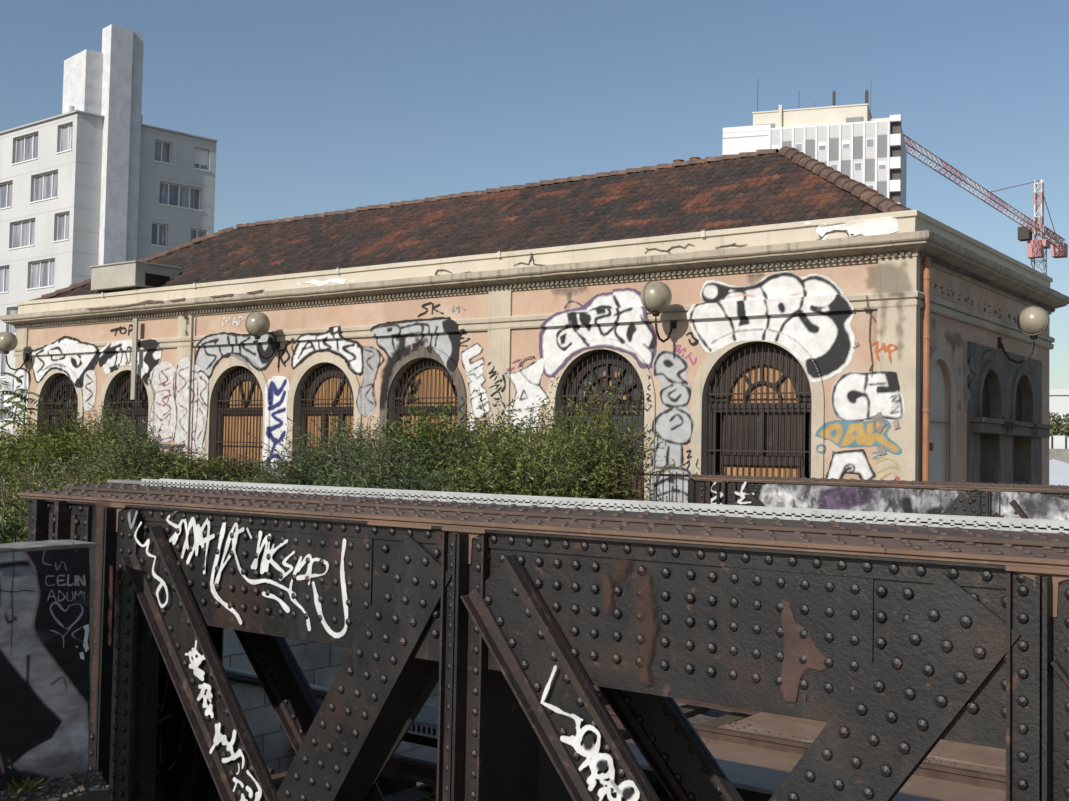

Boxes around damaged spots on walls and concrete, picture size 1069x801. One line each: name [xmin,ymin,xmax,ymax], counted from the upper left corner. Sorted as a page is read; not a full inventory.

peeling [804,217,899,240]
crack [644,243,747,254]